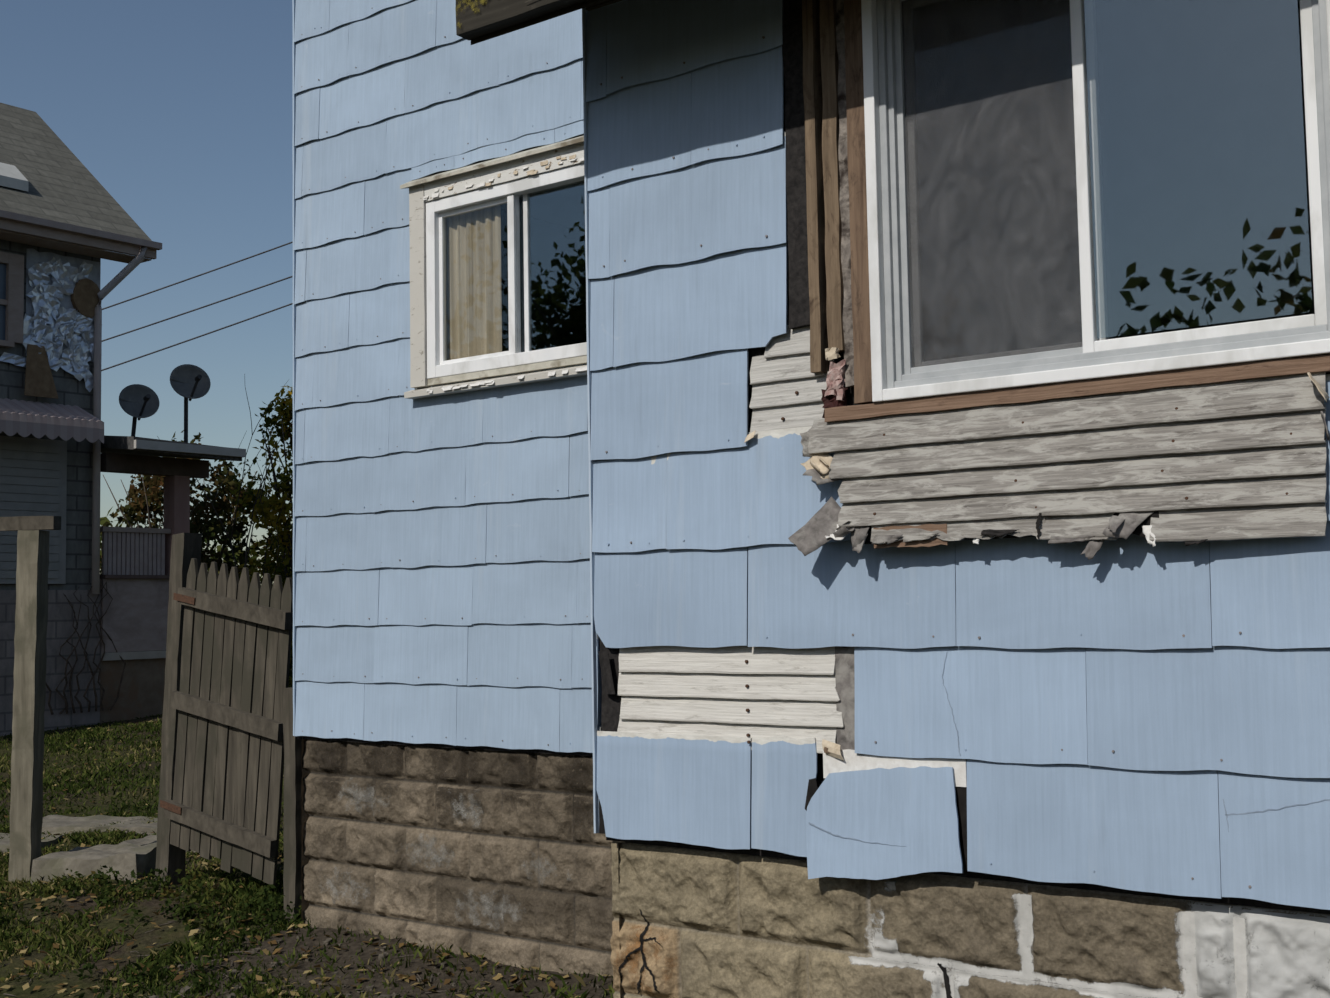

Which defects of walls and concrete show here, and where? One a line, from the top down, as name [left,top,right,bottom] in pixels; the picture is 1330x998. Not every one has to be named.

peeling [23,257,102,377]
peeling [833,521,868,549]
crack [1223,799,1330,832]
crack [618,909,661,994]
crack [937,963,952,998]